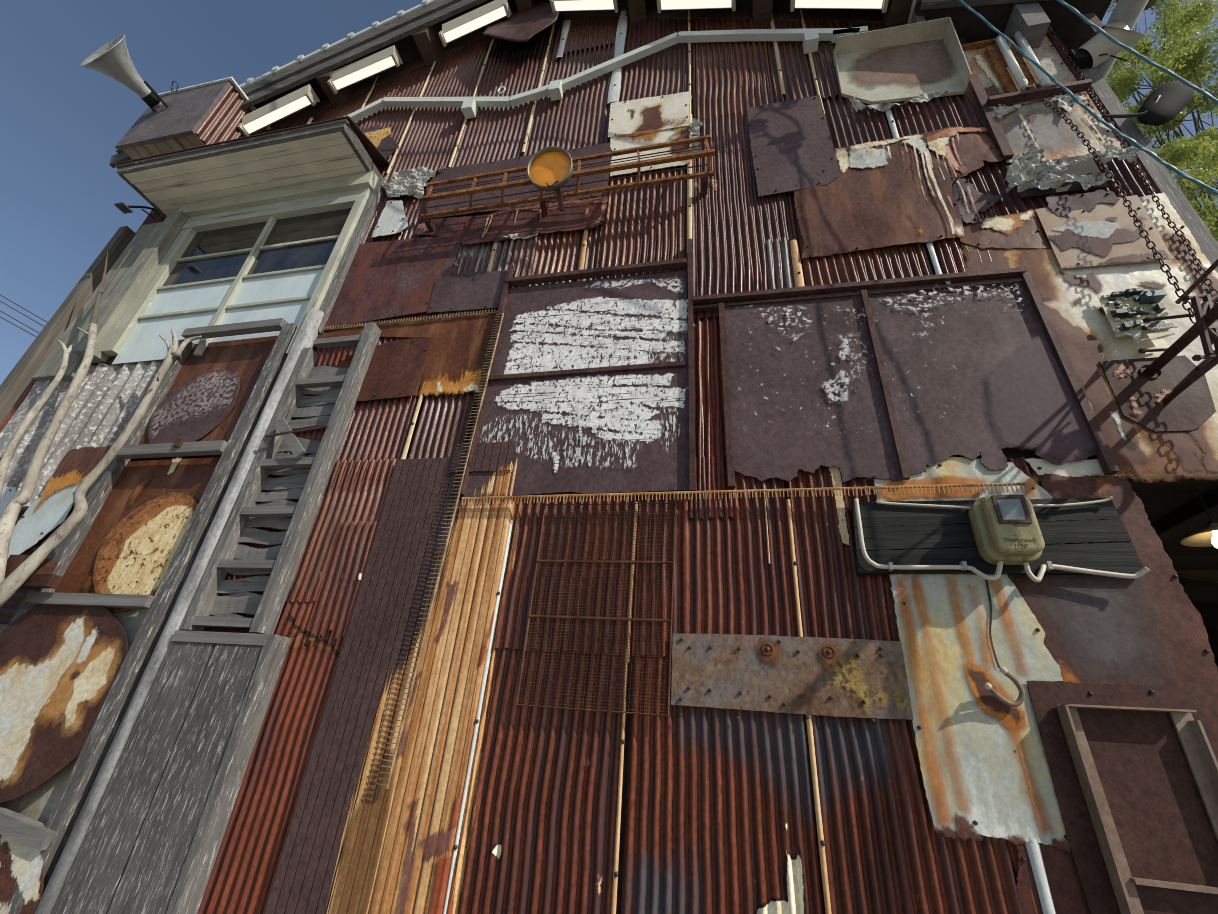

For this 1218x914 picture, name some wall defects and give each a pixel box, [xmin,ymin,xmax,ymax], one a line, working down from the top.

rust [617,104,691,161]
peeling [748,306,873,433]
peeling [880,281,1022,343]
rust [967,248,1218,498]
rust [1159,233,1218,322]
rust [879,475,985,500]
peeling [95,494,195,610]
peeling [326,278,689,914]
peeling [0,617,117,782]
rust [820,576,1025,845]
rust [951,580,1071,853]
peeling [0,835,43,914]